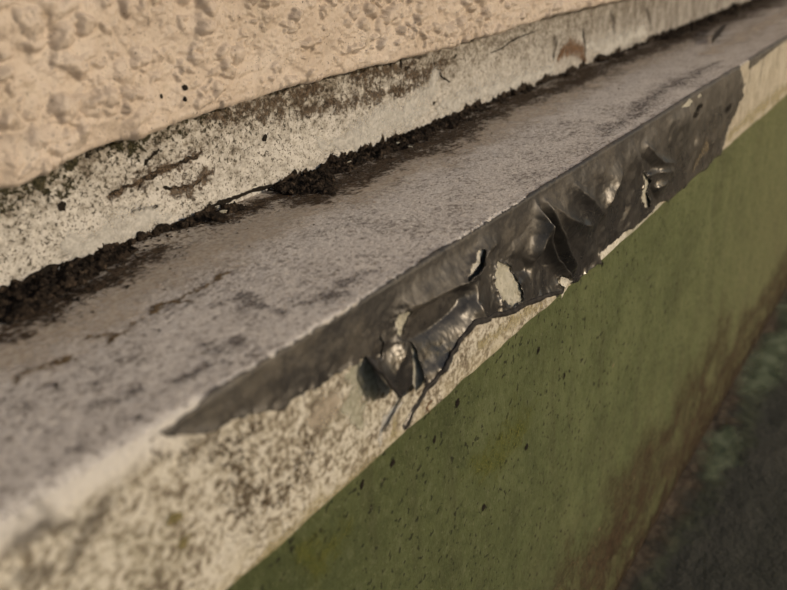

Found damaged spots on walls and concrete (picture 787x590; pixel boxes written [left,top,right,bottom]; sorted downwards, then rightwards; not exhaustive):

water stain [0,35,723,385]
peeling [159,36,787,437]